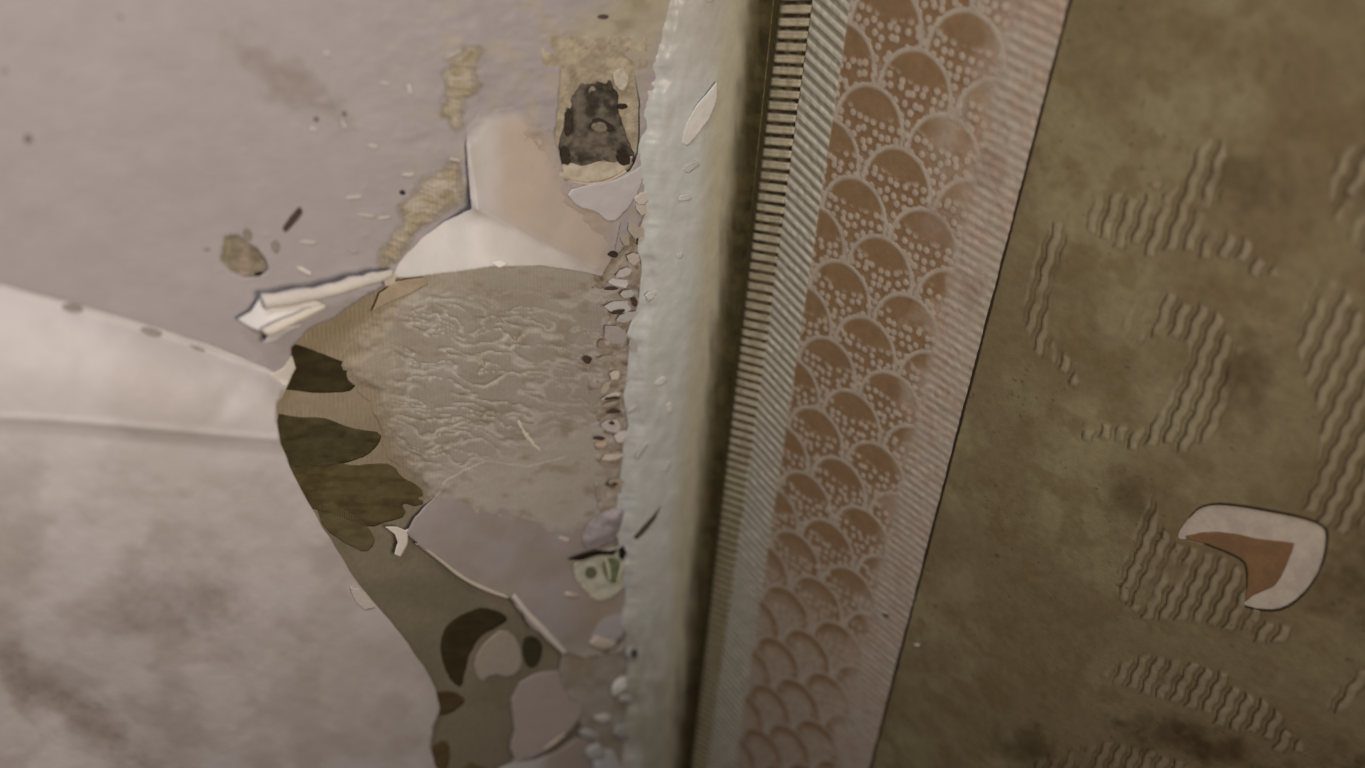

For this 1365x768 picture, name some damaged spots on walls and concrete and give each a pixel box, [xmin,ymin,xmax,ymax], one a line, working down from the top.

peeling [442,46,481,130]
peeling [682,83,717,146]
peeling [203,207,317,277]
peeling [345,157,467,270]
spalling [542,36,661,660]
peeling [611,676,633,703]
peeling [579,713,628,768]